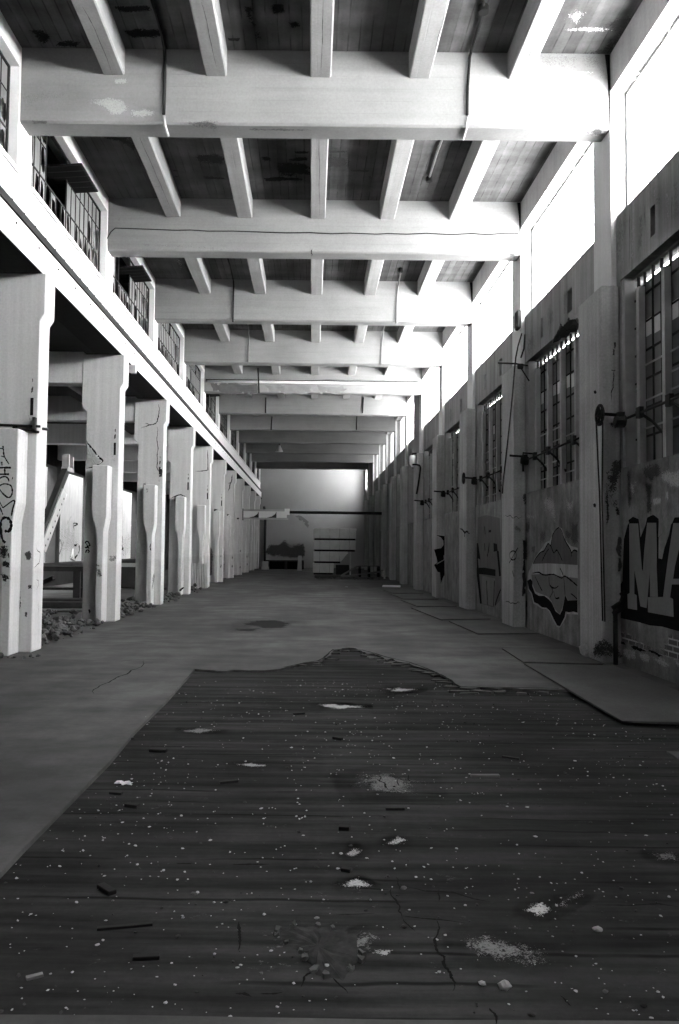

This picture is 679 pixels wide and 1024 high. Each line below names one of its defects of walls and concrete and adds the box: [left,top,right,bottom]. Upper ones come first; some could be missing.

crack [145,404,160,471]
crack [339,877,489,989]